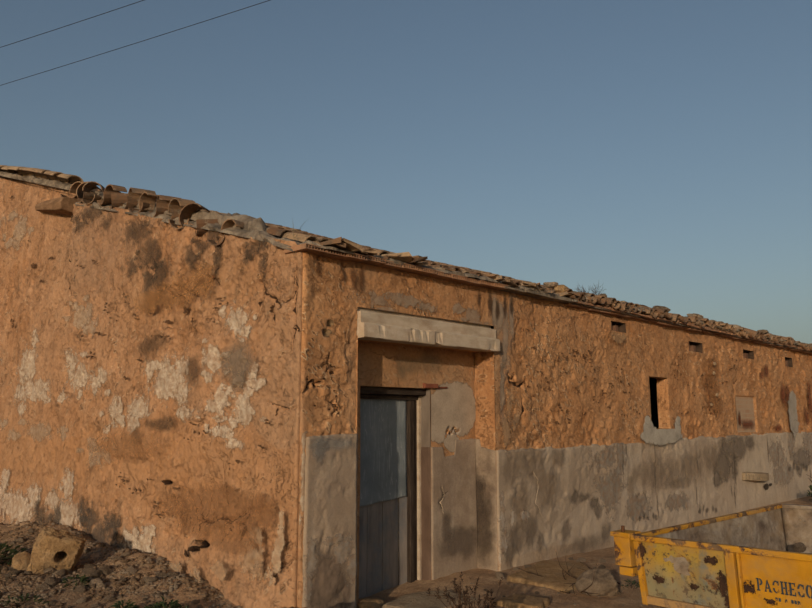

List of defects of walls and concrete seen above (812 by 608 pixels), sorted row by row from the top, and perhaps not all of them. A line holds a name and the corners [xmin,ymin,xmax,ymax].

peeling [14,294,270,469]
crack [258,261,300,350]
crack [266,356,343,416]
damp [478,293,514,412]